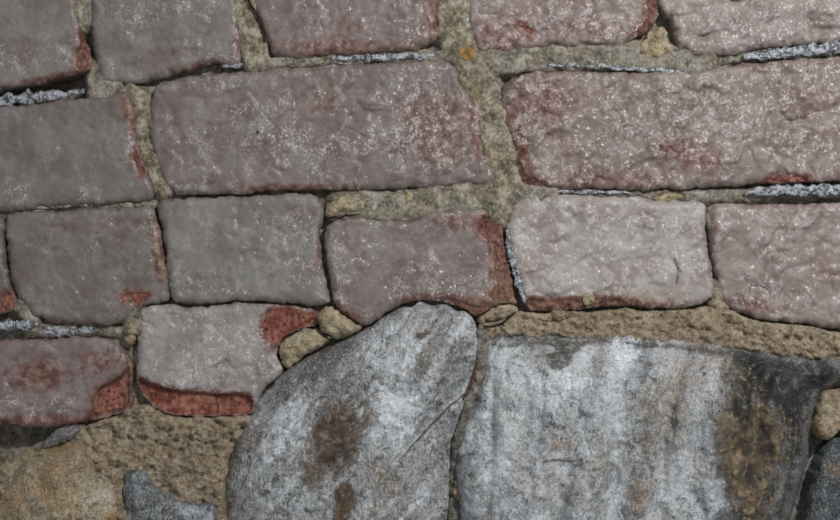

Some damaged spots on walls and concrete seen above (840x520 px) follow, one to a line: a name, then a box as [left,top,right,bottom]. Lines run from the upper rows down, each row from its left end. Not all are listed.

crack [398,360,487,462]